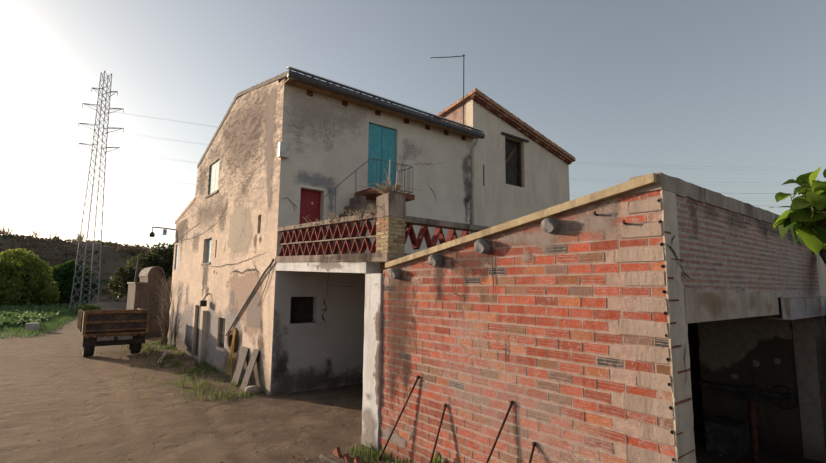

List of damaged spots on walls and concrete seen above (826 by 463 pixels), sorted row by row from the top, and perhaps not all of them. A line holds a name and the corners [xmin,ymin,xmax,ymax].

crack [212,208,268,288]
damp [276,352,363,394]
peeling [697,313,792,379]